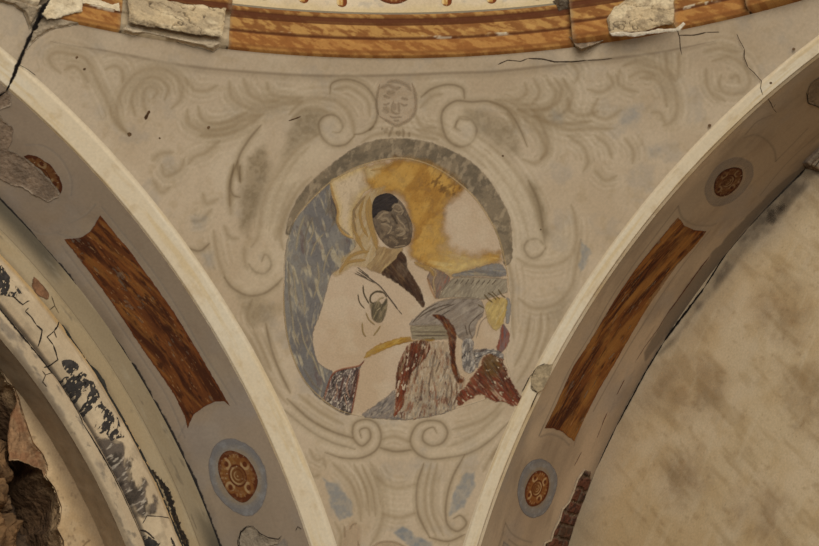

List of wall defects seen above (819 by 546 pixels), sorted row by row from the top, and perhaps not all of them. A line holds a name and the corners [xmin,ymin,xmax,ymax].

crack [0,0,50,96]
peeling [82,0,120,11]
crack [737,35,777,113]
crack [0,198,76,284]
spalling [0,369,64,546]
crack [0,296,169,543]
crack [113,335,222,546]
mould [151,470,189,546]
flaking render [544,470,591,546]